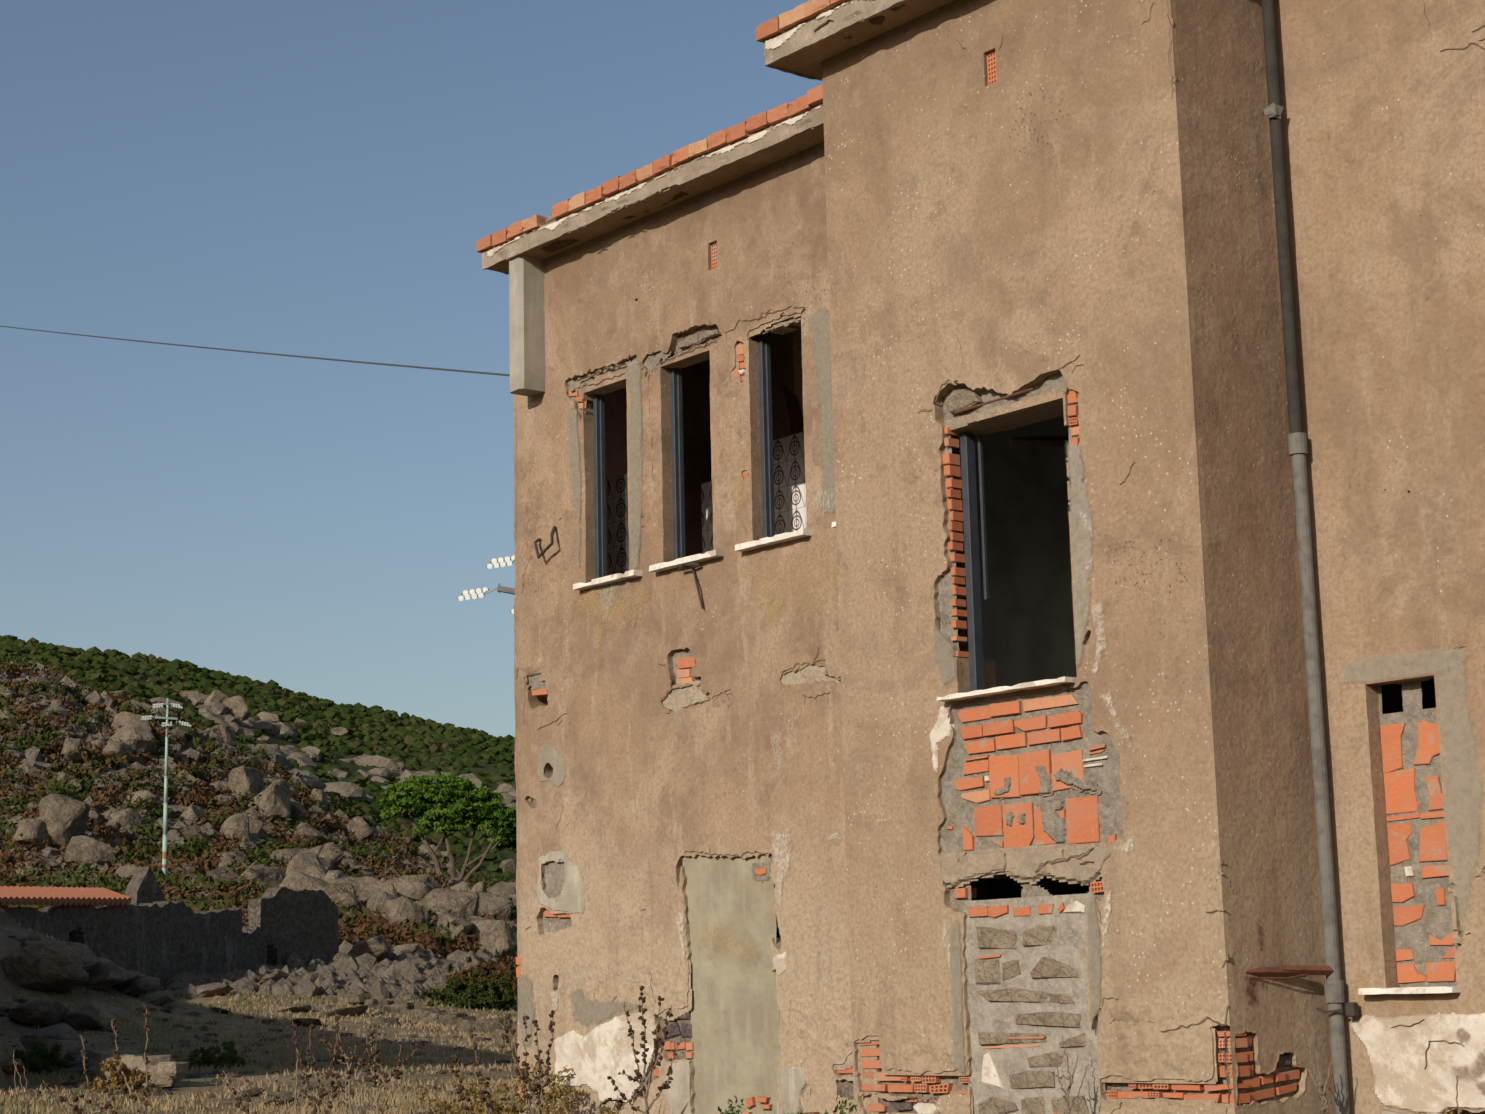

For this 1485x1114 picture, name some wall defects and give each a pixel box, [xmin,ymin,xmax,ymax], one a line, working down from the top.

peeling [765,0,906,51]
crack [1422,0,1485,52]
spalling [568,239,829,419]
peeling [783,385,804,434]
flaking render [938,373,1085,658]
spalling [662,649,732,714]
spalling [940,682,1124,858]
spalling [540,858,572,934]
spalling [583,958,694,1081]
flaking render [835,1040,973,1114]
spalling [1097,1008,1300,1114]
peeling [1456,1053,1485,1114]